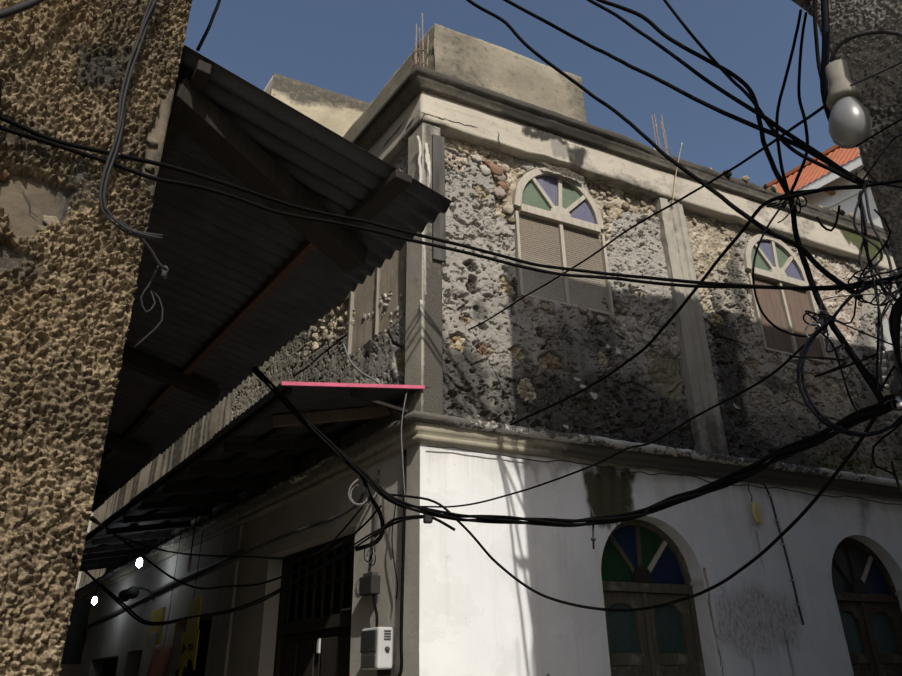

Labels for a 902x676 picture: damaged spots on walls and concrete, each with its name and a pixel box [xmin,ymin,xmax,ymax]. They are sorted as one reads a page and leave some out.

leakage [80,44,127,89]
leakage [523,124,586,168]
spalling [0,169,66,239]
spalling [445,138,526,225]
spalling [541,161,657,255]
spalling [605,296,680,355]
leakage [583,464,635,528]